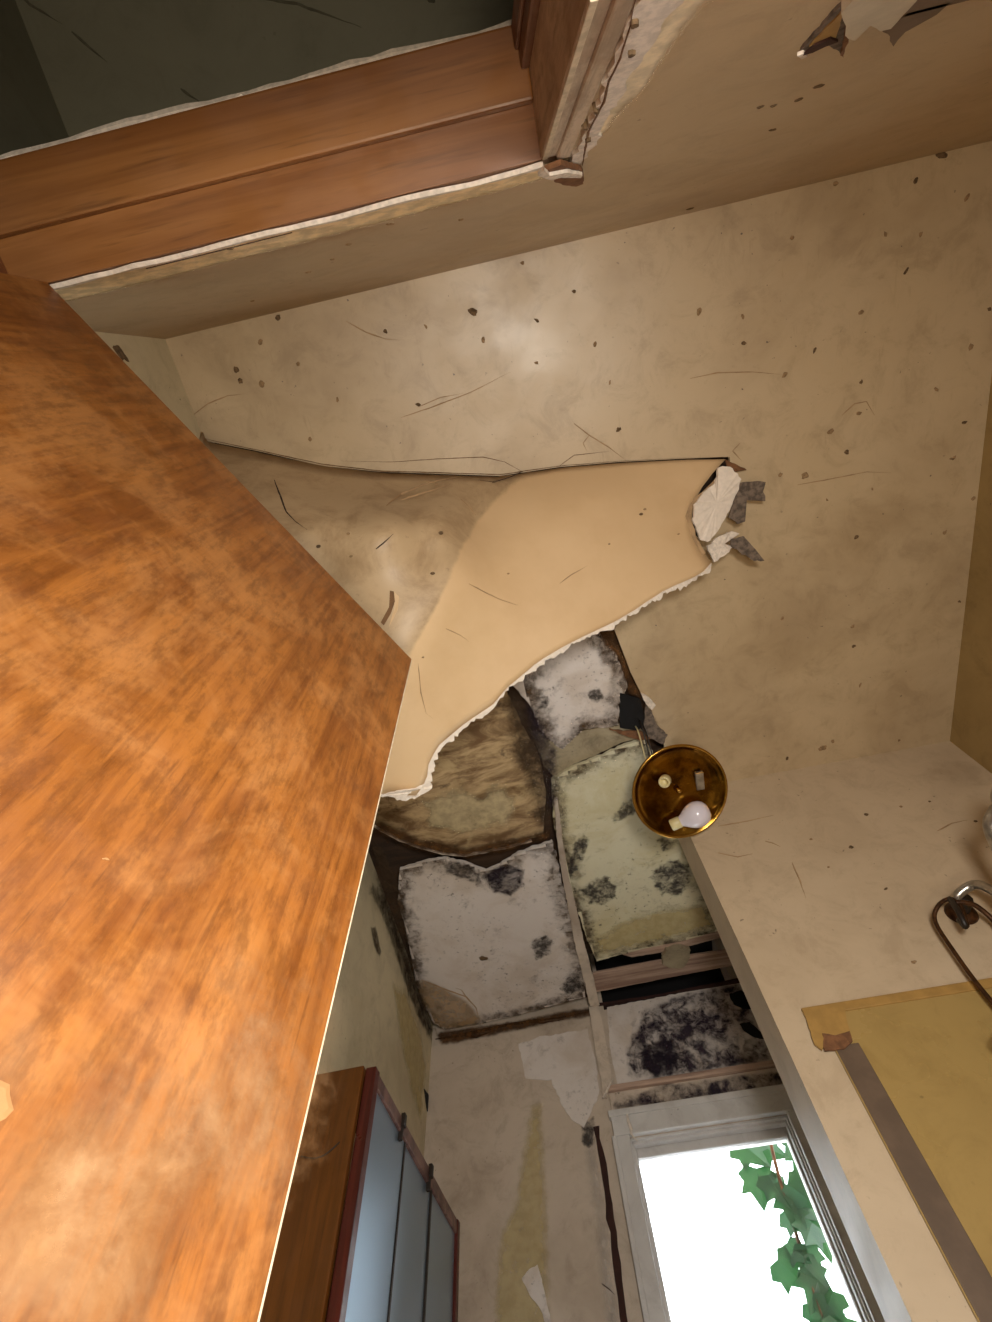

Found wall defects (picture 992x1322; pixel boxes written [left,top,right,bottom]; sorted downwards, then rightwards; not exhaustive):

spalling [797,2,849,59]
spalling [0,0,684,290]
leakage [598,630,641,696]
leakage [588,690,603,700]
leakage [618,800,635,820]
leakage [372,691,590,1044]
mould [581,877,616,905]
mould [655,838,689,895]
peeling [518,983,773,1128]
mould [616,985,783,1108]
leakage [582,1122,594,1148]